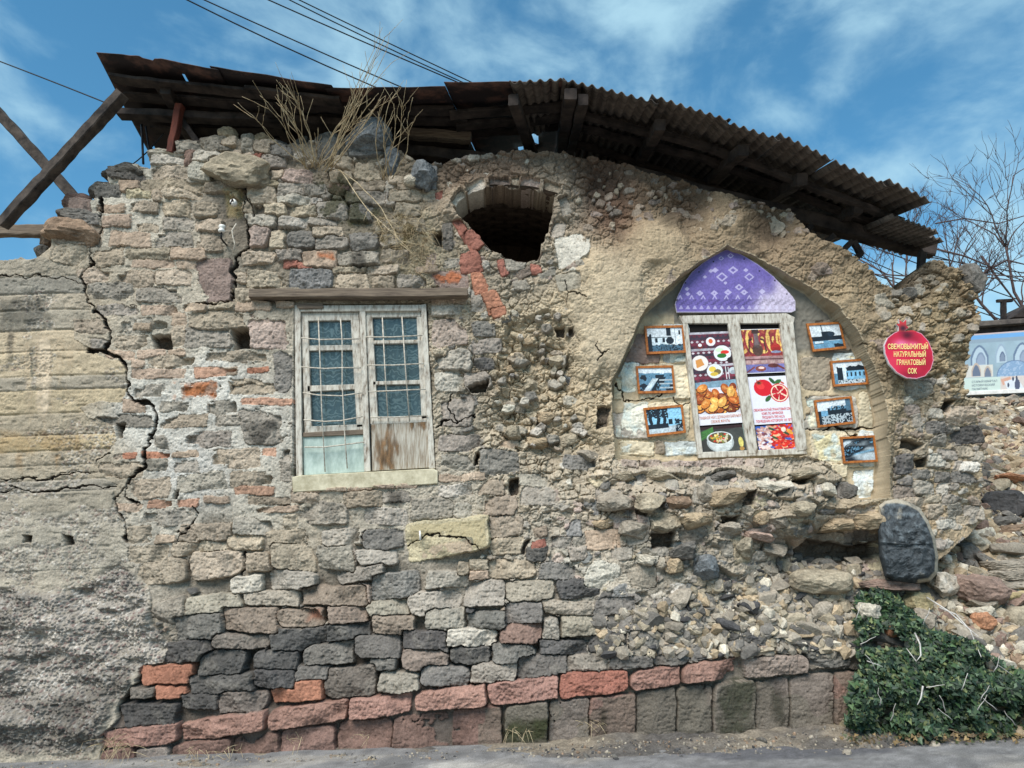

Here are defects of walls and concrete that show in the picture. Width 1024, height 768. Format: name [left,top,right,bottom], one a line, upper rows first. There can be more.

crack [197,188,255,306]
crack [0,196,159,541]
crack [408,532,479,548]